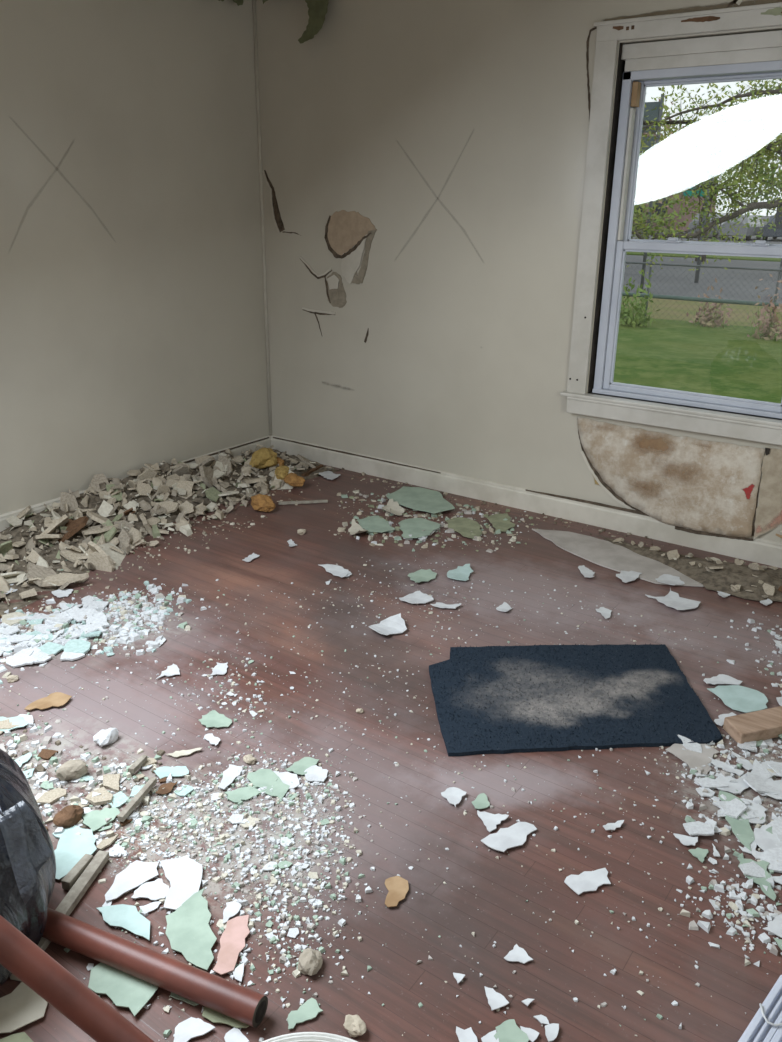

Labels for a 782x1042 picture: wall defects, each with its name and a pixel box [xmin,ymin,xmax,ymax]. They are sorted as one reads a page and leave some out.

peeling [298,0,329,44]
crack [727,0,743,8]
crack [262,170,332,279]
spalling [324,210,377,308]
crack [302,307,335,335]
damp [637,436,669,453]